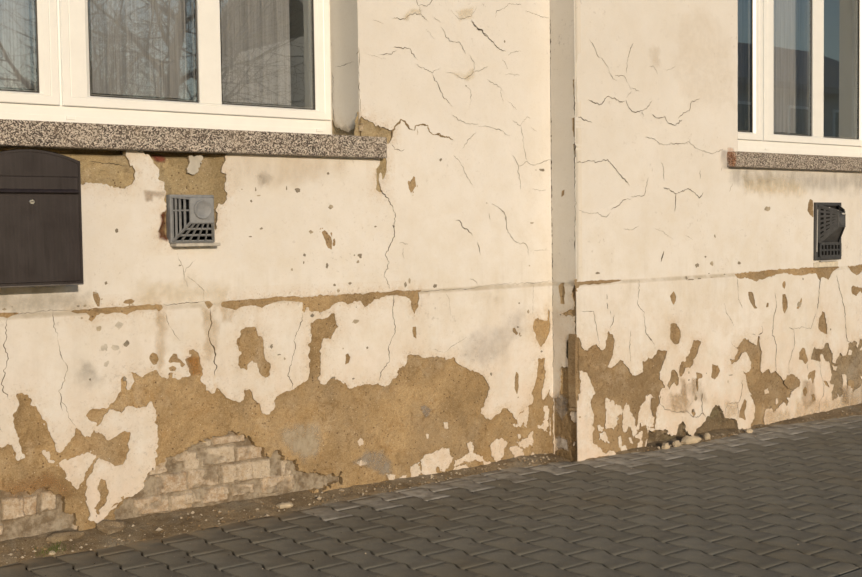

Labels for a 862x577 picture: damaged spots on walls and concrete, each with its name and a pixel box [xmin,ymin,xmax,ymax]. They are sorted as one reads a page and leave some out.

crack [332,0,553,211]
crack [574,42,723,154]
flaking render [0,147,135,189]
flaking render [139,151,227,238]
crack [574,143,703,247]
crack [1,310,73,423]
crack [379,189,396,380]
flaking render [0,272,862,541]
crack [583,290,655,361]
crack [663,382,743,418]
crack [759,278,849,371]